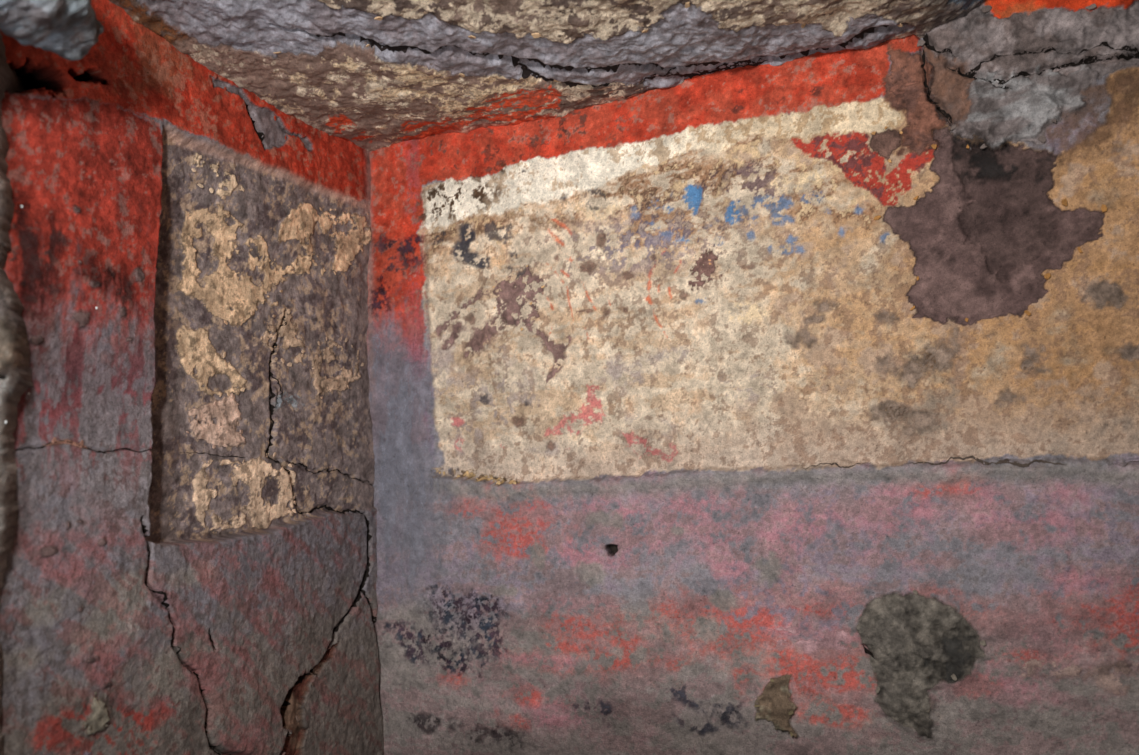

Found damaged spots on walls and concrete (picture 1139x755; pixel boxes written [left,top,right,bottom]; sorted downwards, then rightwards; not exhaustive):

crack [921,33,1139,124]
spalling [137,0,1139,399]
crack [16,440,151,453]
peeling [176,325,296,533]
crack [180,316,377,685]
water stain [372,334,502,672]
crack [141,524,231,755]
spalling [754,674,798,738]